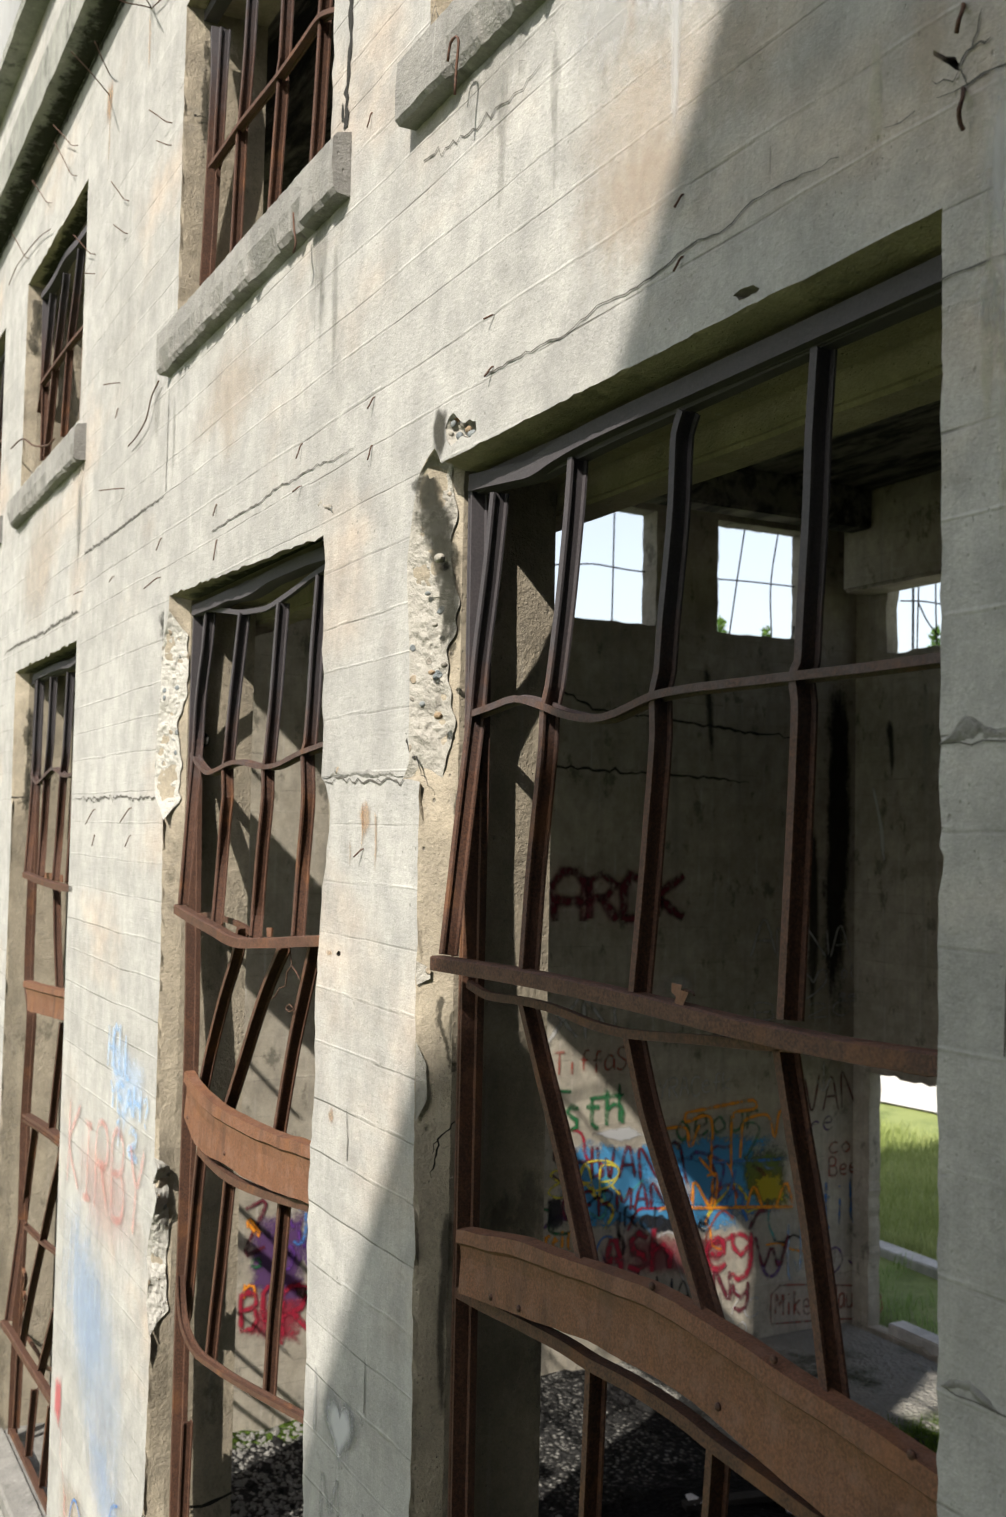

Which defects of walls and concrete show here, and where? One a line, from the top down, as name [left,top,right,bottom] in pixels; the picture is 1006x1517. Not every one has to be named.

crack [423,60,541,162]
crack [885,9,1006,128]
crack [487,157,838,375]
crack [940,253,1006,281]
spalling [323,410,476,779]
spalling [155,611,189,820]
crack [322,776,403,786]
crack [940,739,1006,747]